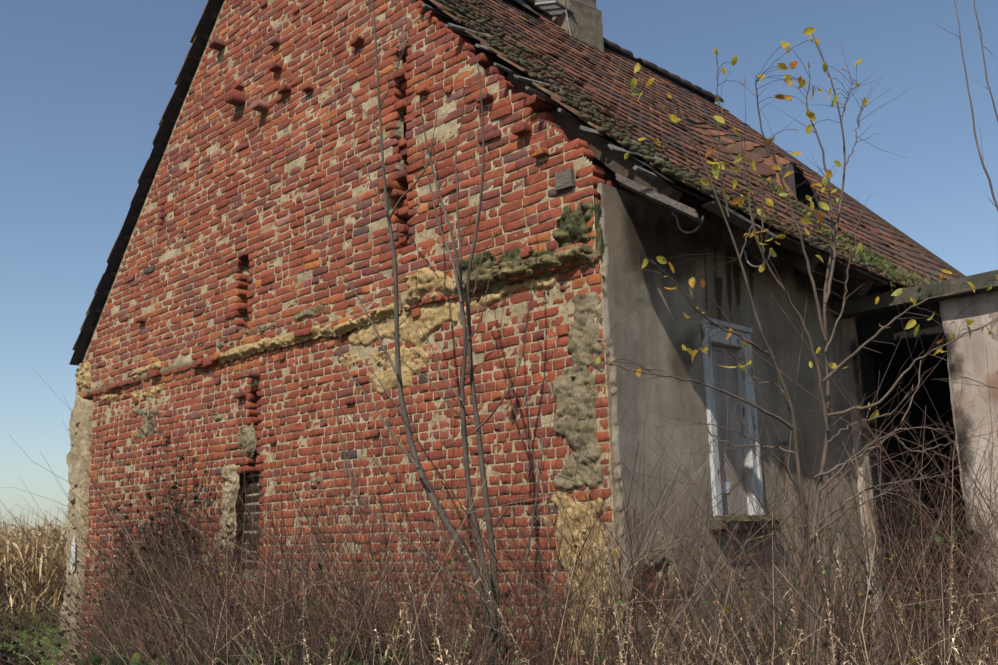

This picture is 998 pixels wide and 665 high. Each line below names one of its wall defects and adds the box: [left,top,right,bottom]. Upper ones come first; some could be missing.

spalling [338,274,559,394]
spalling [75,362,91,389]
spalling [100,383,165,402]